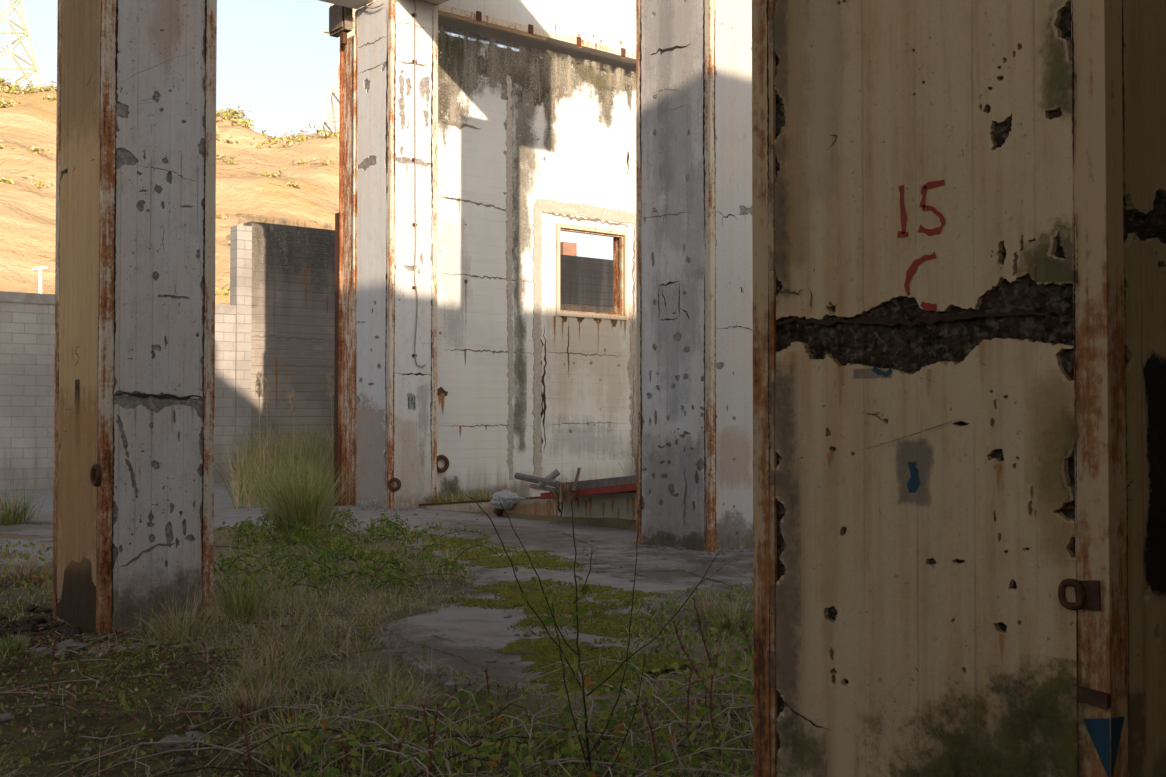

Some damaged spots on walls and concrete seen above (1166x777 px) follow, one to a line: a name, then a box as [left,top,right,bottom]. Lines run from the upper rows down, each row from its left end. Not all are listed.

spalling [1058,4,1071,43]
spalling [987,106,1012,148]
crack [73,0,207,621]
spalling [196,276,204,370]
leakage [438,24,636,450]
crack [357,0,812,543]
spalling [776,243,1074,380]
spalling [1123,191,1166,245]
spalling [113,376,203,498]
peeling [131,501,202,567]
leakage [56,556,96,632]